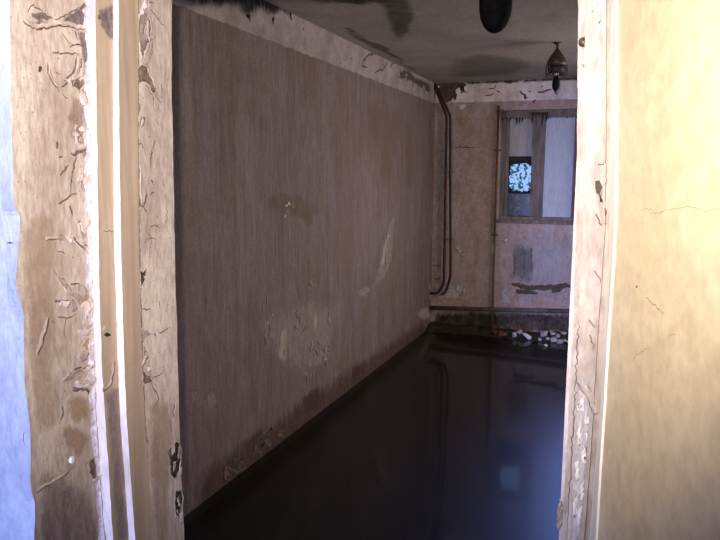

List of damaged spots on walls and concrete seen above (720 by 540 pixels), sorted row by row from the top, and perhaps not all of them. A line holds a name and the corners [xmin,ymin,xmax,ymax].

spalling [138,0,157,96]
spalling [65,75,88,106]
peeling [72,124,88,147]
peeling [64,212,89,253]
water stain [514,234,564,300]
peeling [57,276,96,388]
peeling [64,427,86,464]
peeling [84,455,100,483]
spalling [167,439,182,480]
peeling [571,377,590,540]
crack [567,317,599,539]
spalling [173,488,184,523]